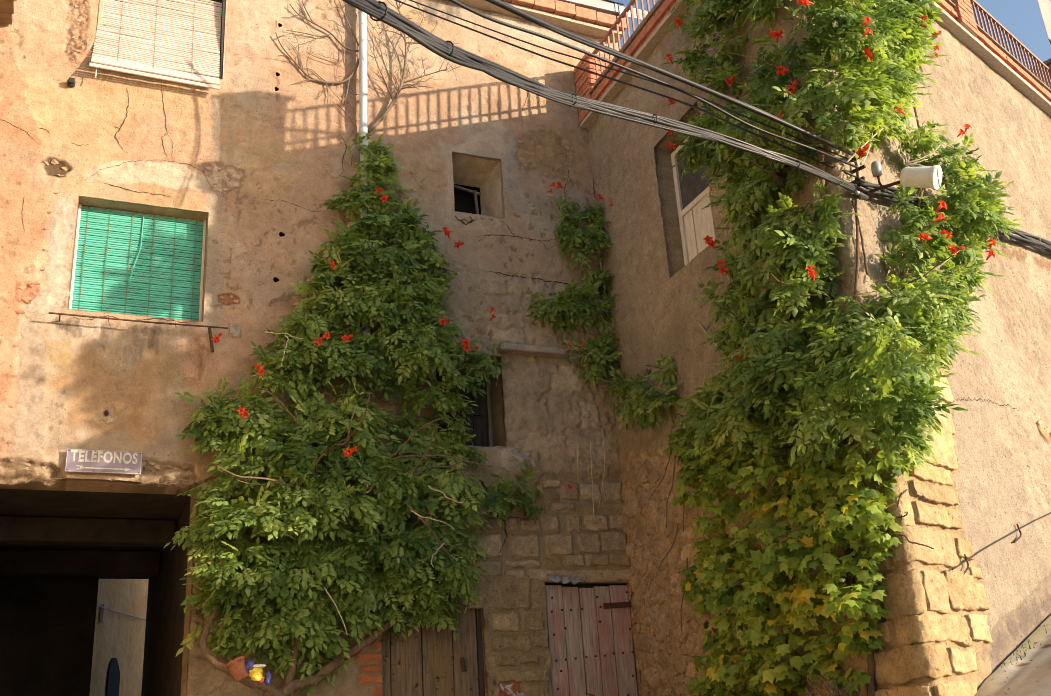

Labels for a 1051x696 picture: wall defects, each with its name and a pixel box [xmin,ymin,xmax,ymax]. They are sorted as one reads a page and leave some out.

crack [87,87,212,196]
spalling [42,158,70,177]
spalling [202,162,244,194]
crack [953,397,1018,411]
spalling [141,456,194,488]